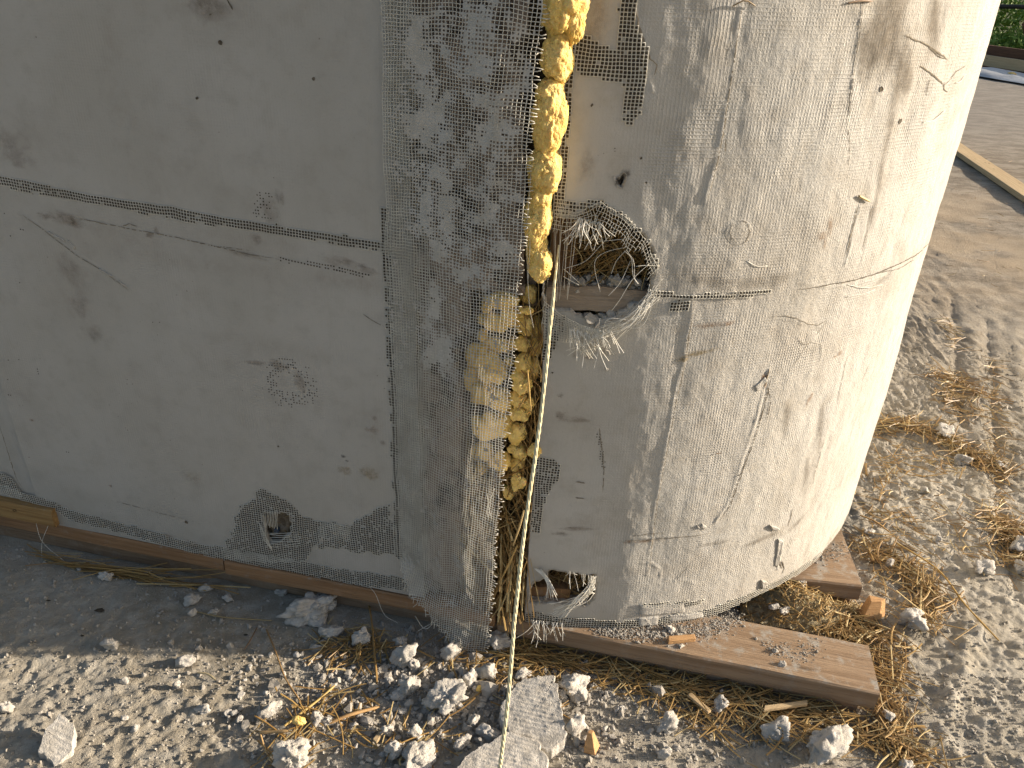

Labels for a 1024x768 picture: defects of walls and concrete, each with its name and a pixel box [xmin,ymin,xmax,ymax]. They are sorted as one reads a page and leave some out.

peeling [572,0,650,126]
spalling [537,199,659,426]
crack [724,242,930,514]
peeling [222,488,397,564]
peeling [527,457,561,555]
spalling [524,569,598,614]